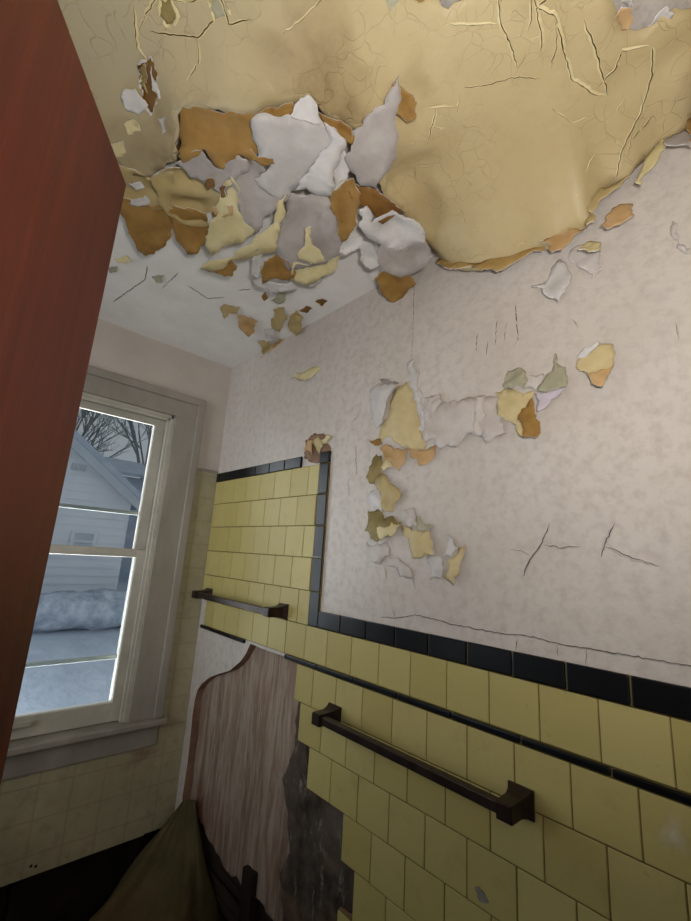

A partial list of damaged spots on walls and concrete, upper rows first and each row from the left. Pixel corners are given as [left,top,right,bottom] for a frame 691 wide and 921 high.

crack [281,0,321,35]
crack [133,0,250,93]
peeling [58,0,691,358]
peeling [304,433,332,464]
peeling [365,340,615,585]
crack [509,522,660,577]
crack [379,611,691,667]
spalling [138,828,161,855]
spalling [19,843,124,921]